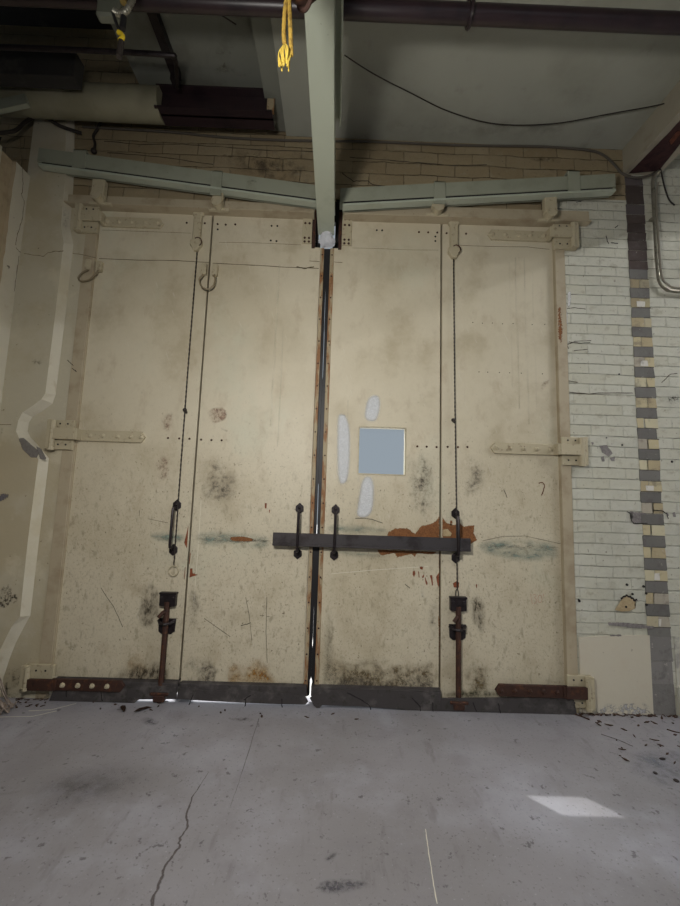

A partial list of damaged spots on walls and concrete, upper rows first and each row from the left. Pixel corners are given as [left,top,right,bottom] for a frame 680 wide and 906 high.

crack [151,773,208,906]